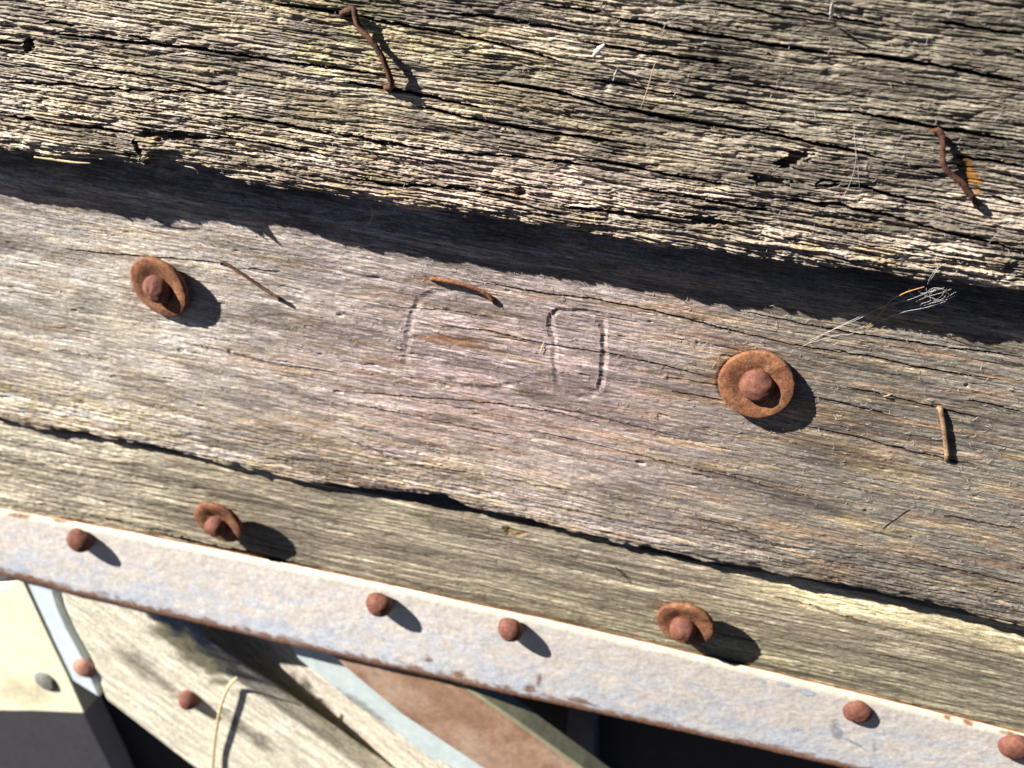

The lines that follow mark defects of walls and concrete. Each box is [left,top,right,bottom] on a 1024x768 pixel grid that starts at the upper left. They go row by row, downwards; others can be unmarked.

crack [0,0,1024,251]
rust [959,159,982,194]
crack [66,248,220,264]
crack [179,341,777,489]
crack [800,425,975,465]
crack [341,436,598,502]
crack [22,502,319,569]
crack [684,516,782,546]
crack [944,515,1022,531]
crack [903,555,1024,586]
crack [774,596,871,624]
rust [0,568,860,768]